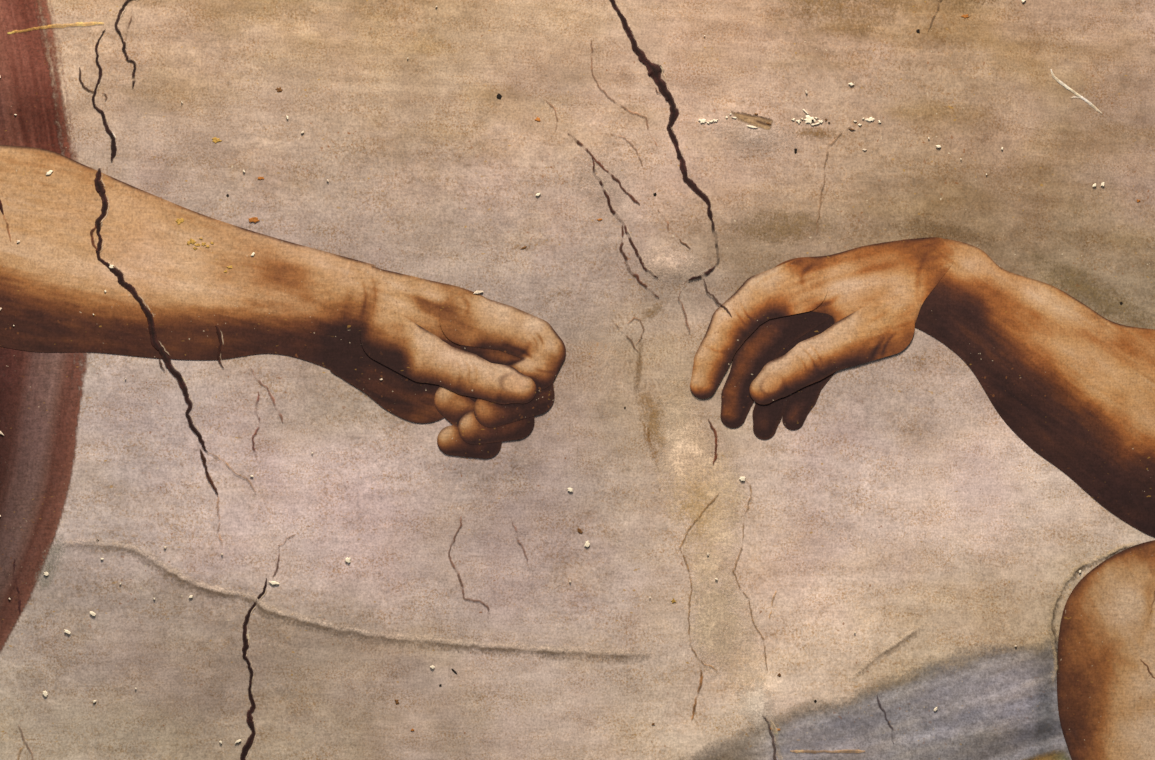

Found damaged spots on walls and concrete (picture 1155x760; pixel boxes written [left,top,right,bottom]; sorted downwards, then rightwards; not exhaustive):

crack [79,0,256,540]
crack [549,0,732,331]
crack [252,381,283,450]
crack [240,534,296,760]
crack [448,519,489,610]